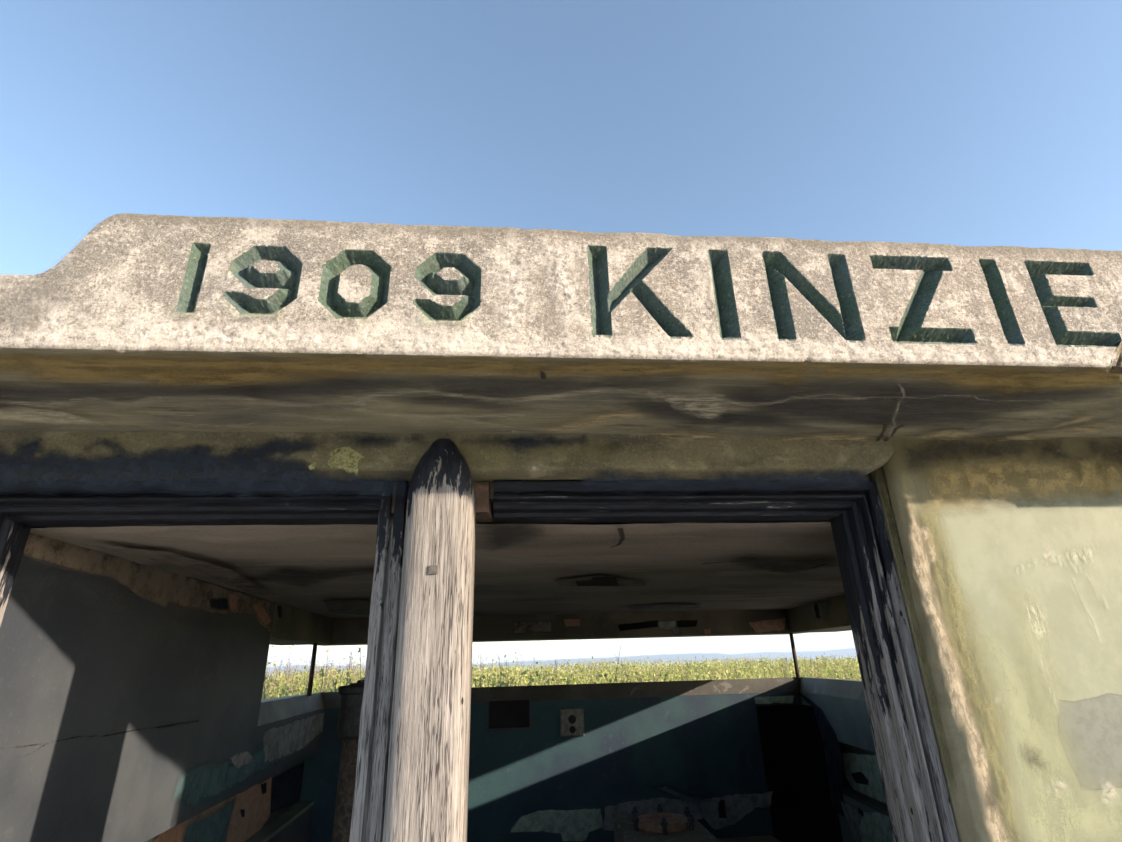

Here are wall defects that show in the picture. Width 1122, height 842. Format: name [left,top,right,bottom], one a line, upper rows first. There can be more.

water stain [0,387,214,423]
water stain [0,440,408,497]
peeling [308,446,365,475]
water stain [241,380,1122,501]
crack [829,383,980,441]
peeling [911,496,1122,842]